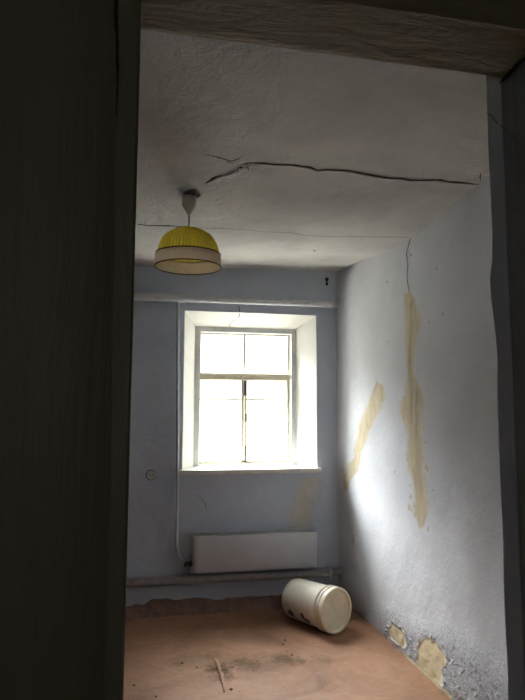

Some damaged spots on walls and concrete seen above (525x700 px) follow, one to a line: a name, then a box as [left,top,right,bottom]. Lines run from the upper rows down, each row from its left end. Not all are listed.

crack [202,154,481,188]
leakage [341,381,388,492]
leakage [395,290,432,533]
flaking render [383,619,498,700]